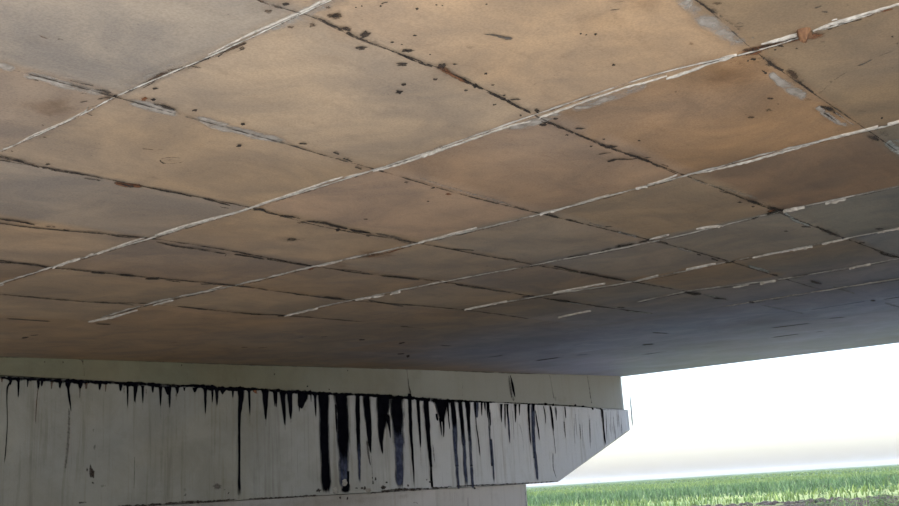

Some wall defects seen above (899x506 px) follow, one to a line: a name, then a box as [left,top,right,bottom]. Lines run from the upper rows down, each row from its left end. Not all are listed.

water stain [1,376,633,494]